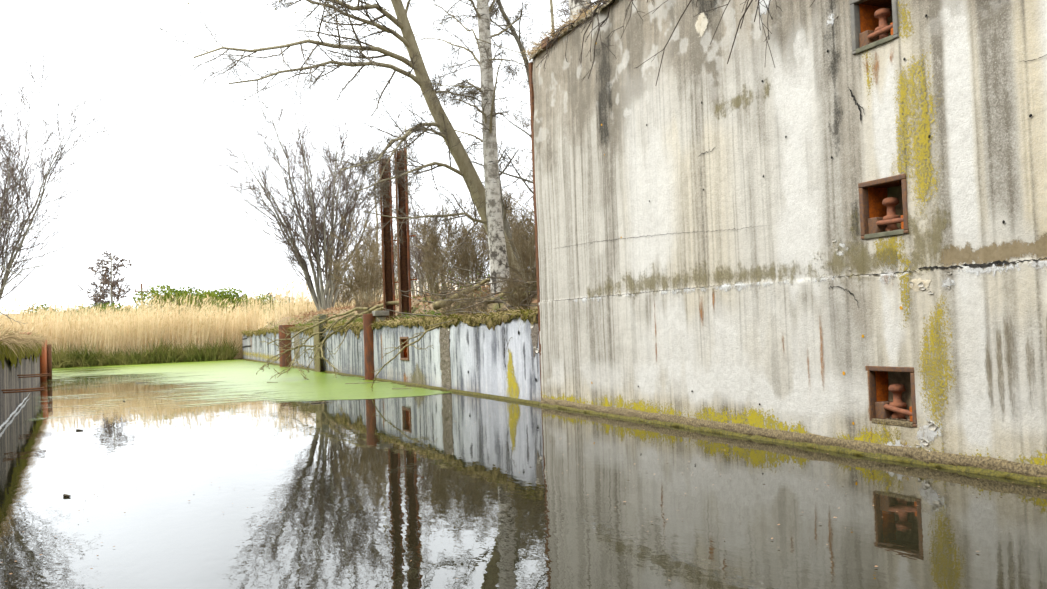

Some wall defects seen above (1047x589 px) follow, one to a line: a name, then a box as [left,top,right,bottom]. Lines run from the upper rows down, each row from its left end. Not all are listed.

damp [596,37,612,143]
damp [714,90,752,119]
damp [829,25,843,153]
damp [568,205,1047,315]
crack [820,257,1047,307]
damp [986,323,1013,407]